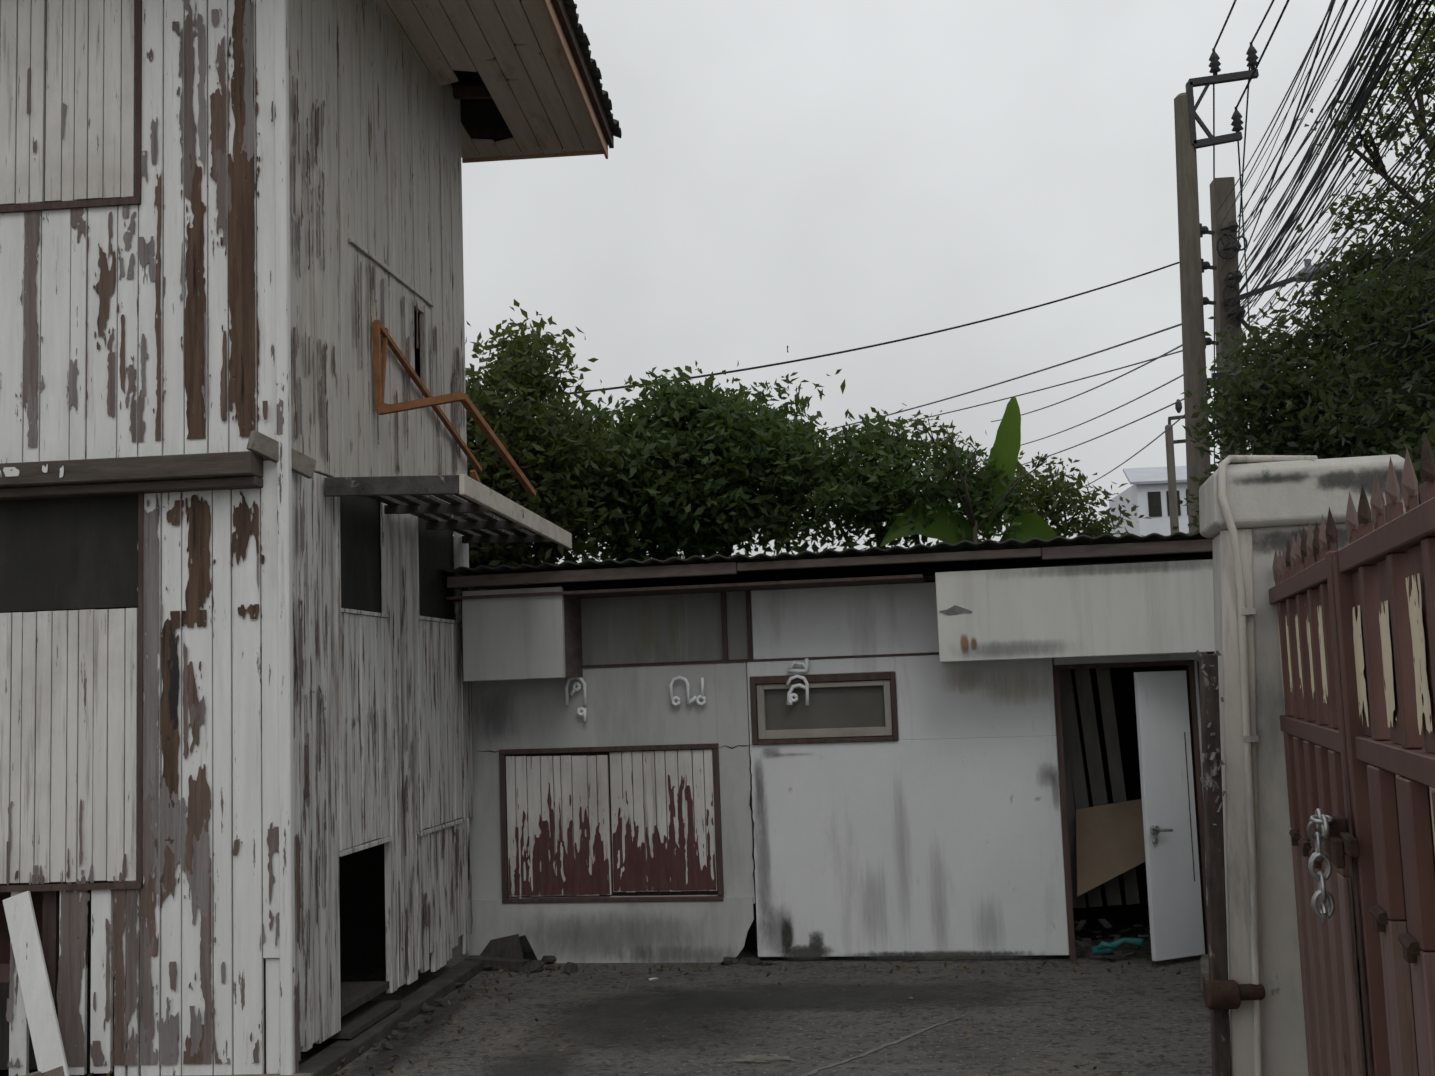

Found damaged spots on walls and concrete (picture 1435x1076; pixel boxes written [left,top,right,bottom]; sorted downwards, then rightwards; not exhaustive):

peeling [15,189,45,447]
peeling [67,117,166,442]
peeling [172,0,335,462]
peeling [0,467,19,477]
water stain [1241,470,1403,499]
corrosion [961,636,976,652]
peeling [1278,606,1328,703]
peeling [1353,605,1369,727]
peeling [1379,600,1397,728]
peeling [1406,573,1432,735]
peeling [6,490,265,1066]
peeling [260,597,327,1073]